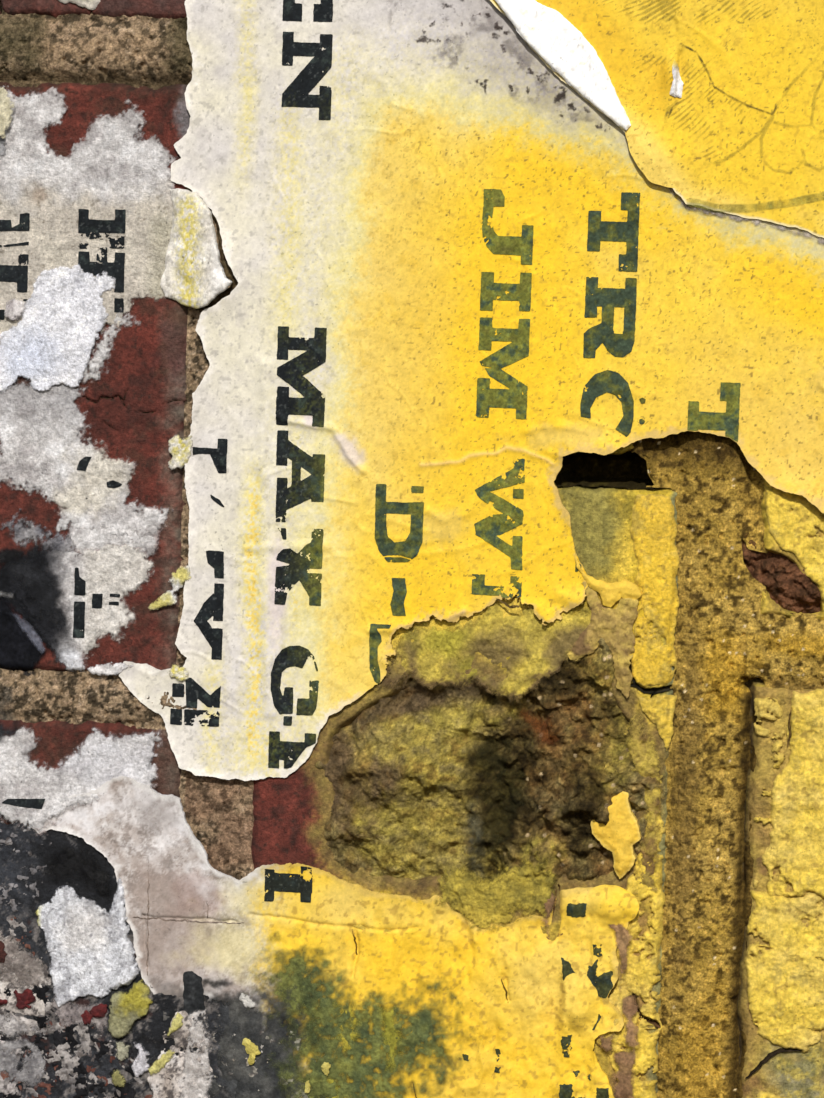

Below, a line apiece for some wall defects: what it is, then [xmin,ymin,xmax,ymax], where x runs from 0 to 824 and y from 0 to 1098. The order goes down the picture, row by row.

peeling [0,87,14,156]
peeling [160,188,232,309]
peeling [0,265,116,393]
peeling [168,435,193,469]
peeling [149,566,191,610]
peeling [169,665,189,682]
peeling [575,494,680,751]
peeling [741,486,824,614]
spalling [315,638,668,1098]
peeling [37,878,175,1087]
peeling [167,1013,184,1036]
peeling [239,993,255,1008]